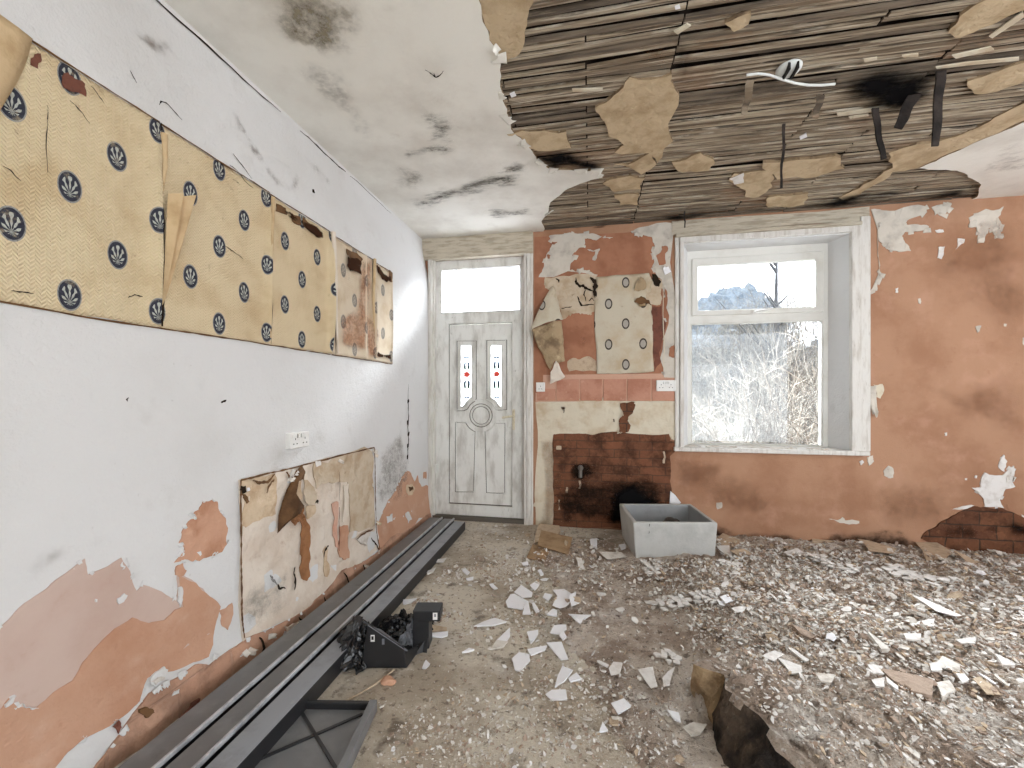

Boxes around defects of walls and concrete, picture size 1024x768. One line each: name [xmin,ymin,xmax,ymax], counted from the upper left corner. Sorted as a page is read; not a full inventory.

water stain [289,2,347,47]
water stain [423,166,520,204]
peeling [539,231,613,277]
peeling [631,222,675,378]
peeling [871,202,954,294]
peeling [968,206,1004,243]
flaking render [552,402,749,529]
flaking render [921,455,1024,554]
peeling [0,470,431,768]